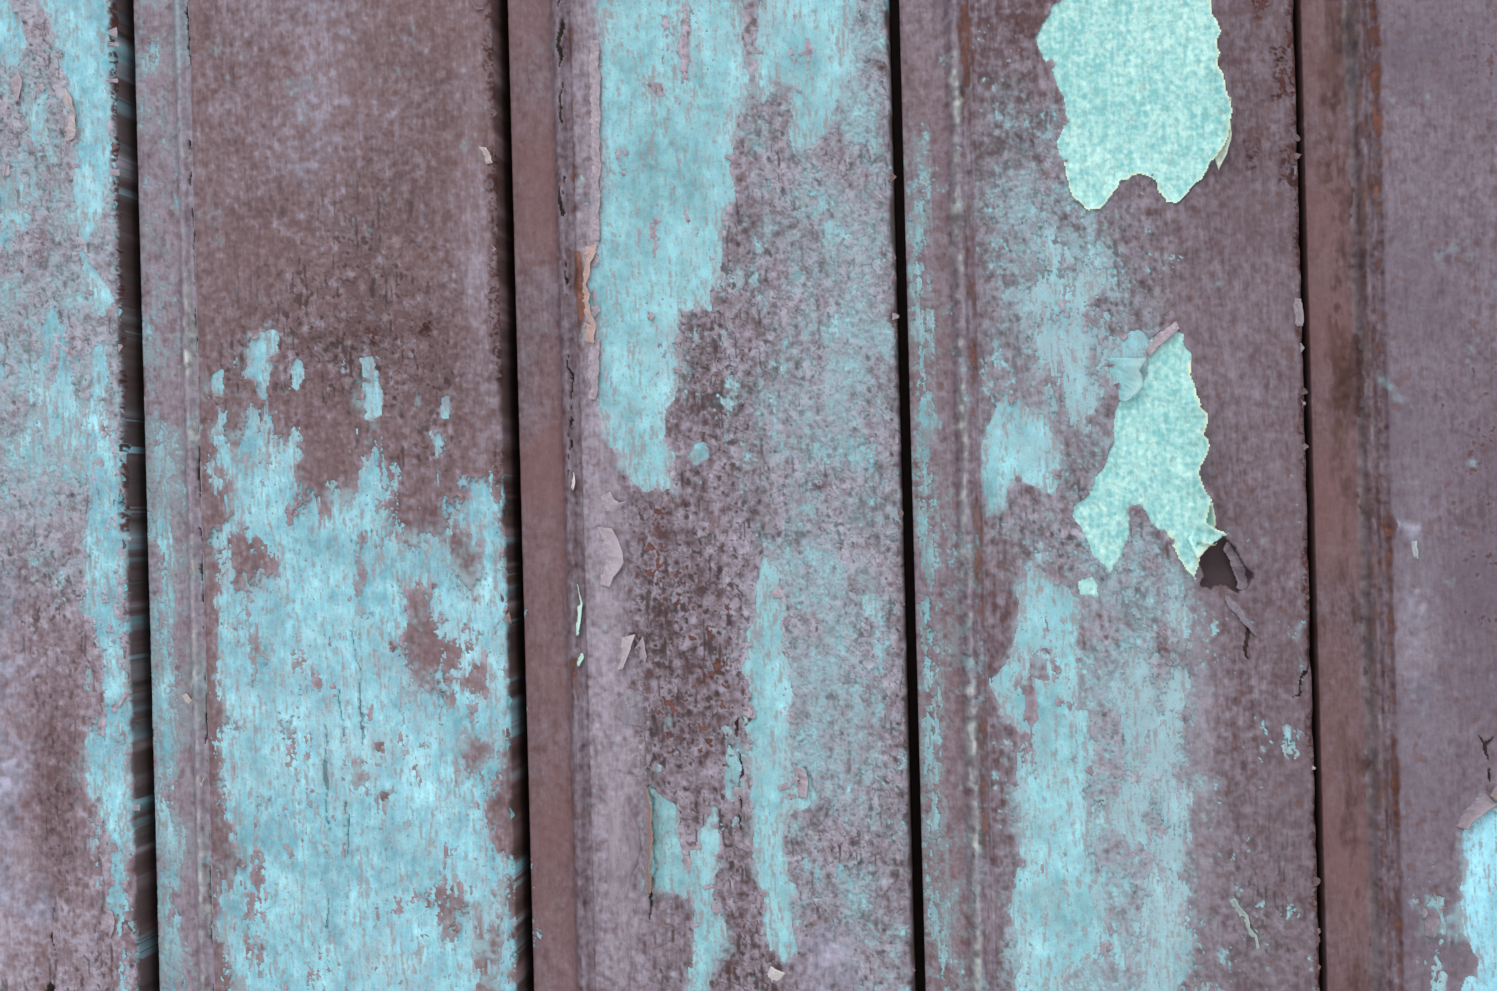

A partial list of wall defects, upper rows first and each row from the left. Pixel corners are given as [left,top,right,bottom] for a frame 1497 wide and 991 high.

peeling [0,0,123,319]
peeling [141,37,160,73]
peeling [582,0,861,492]
peeling [1036,0,1232,210]
peeling [34,301,192,991]
peeling [200,329,542,991]
peeling [598,492,626,587]
peeling [981,208,1260,991]
peeling [1421,785,1497,991]